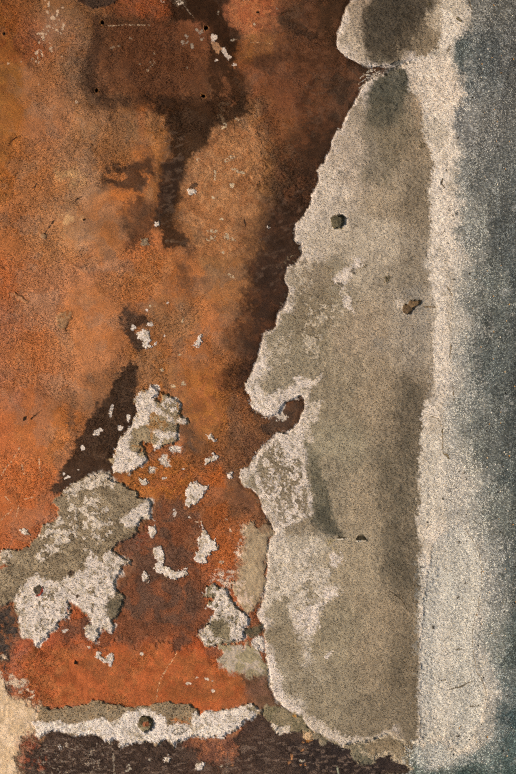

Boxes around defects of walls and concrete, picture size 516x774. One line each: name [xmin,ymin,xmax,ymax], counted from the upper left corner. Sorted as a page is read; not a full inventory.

rust [0,0,37,205]
damp [57,0,262,299]
rust [0,440,57,536]
damp [33,299,156,503]
damp [57,491,256,654]
rust [121,453,204,498]
damp [175,436,218,479]
rust [167,357,231,439]
rust [207,520,244,576]
peeling [30,0,442,771]
damp [201,0,516,774]
rust [8,636,244,711]